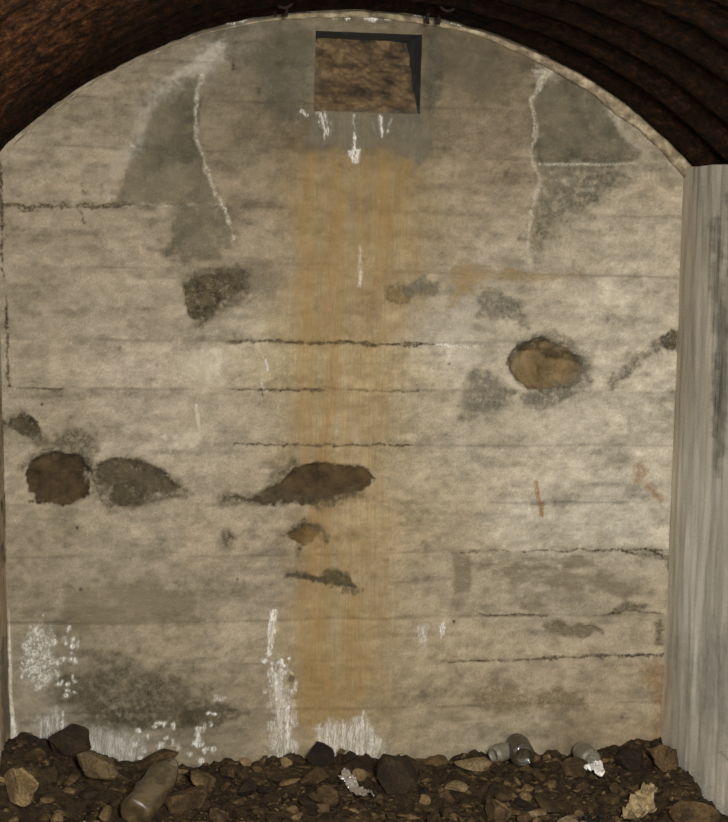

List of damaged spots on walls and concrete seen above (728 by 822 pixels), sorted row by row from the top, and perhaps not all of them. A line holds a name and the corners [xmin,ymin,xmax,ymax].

crack [0,163,134,271]
spalling [184,268,249,326]
spalling [506,334,593,399]
spalling [2,413,187,508]
spalling [222,459,375,508]
spalling [287,519,328,550]
spalling [286,570,356,593]
water stain [0,587,239,763]
efflorescence [262,609,297,758]
efflorescence [316,713,385,758]